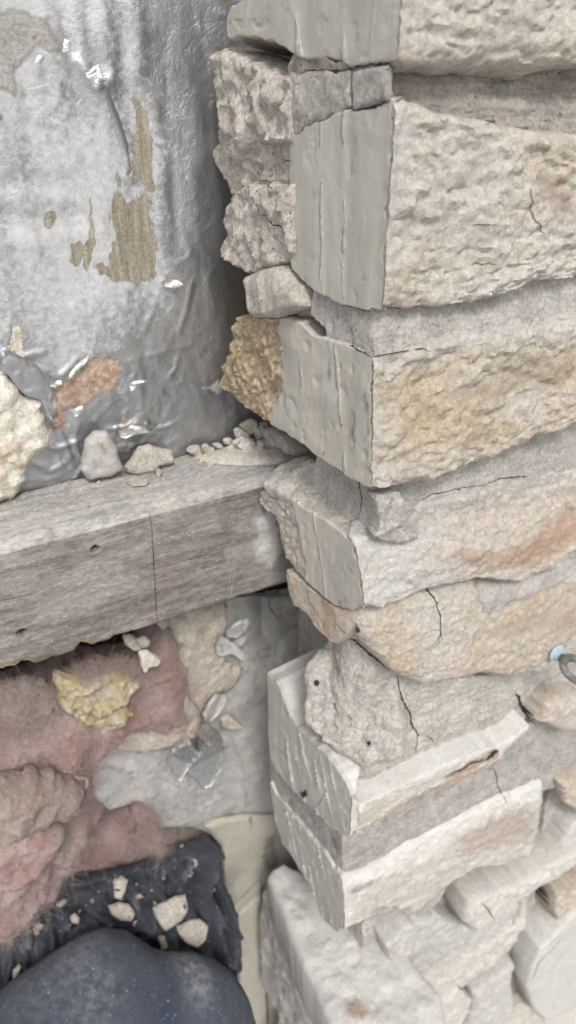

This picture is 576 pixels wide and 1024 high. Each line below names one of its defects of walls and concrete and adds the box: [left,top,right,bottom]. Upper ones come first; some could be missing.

peeling [44,211,56,228]
peeling [70,96,184,289]
crack [529,189,545,235]
peeling [0,325,146,501]
crack [423,475,529,499]
crack [426,588,443,644]
crack [351,638,434,753]
crack [516,694,535,724]